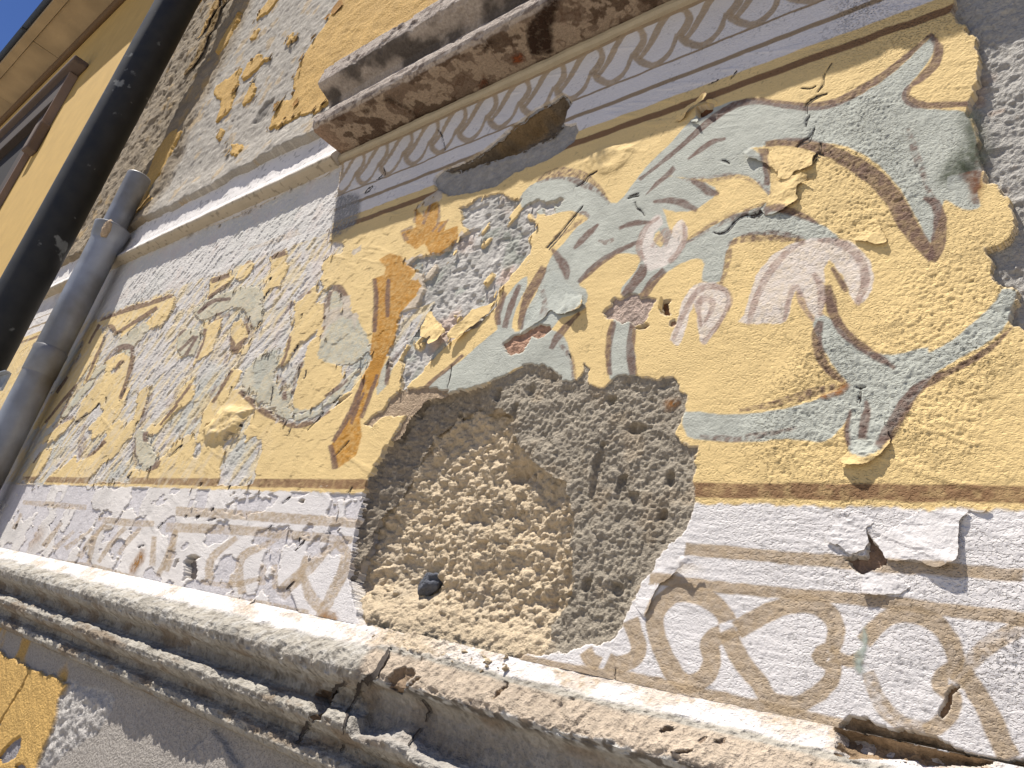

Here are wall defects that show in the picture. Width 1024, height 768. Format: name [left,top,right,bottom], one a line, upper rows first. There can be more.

flaking render [61,0,338,267]
crack [797,63,832,164]
spalling [0,95,700,673]
peeling [825,505,989,595]
crack [295,721,308,744]
crack [330,647,389,752]
crack [408,700,431,746]
spalling [833,718,1024,768]